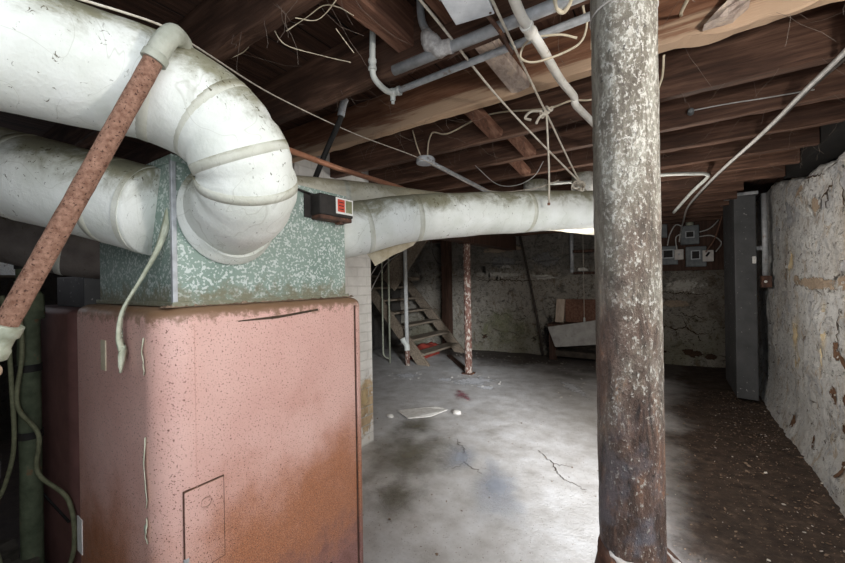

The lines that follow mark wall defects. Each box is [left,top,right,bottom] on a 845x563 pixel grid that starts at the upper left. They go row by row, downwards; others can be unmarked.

peeling [785,254,845,293]
crack [662,290,711,341]
spalling [831,342,845,369]